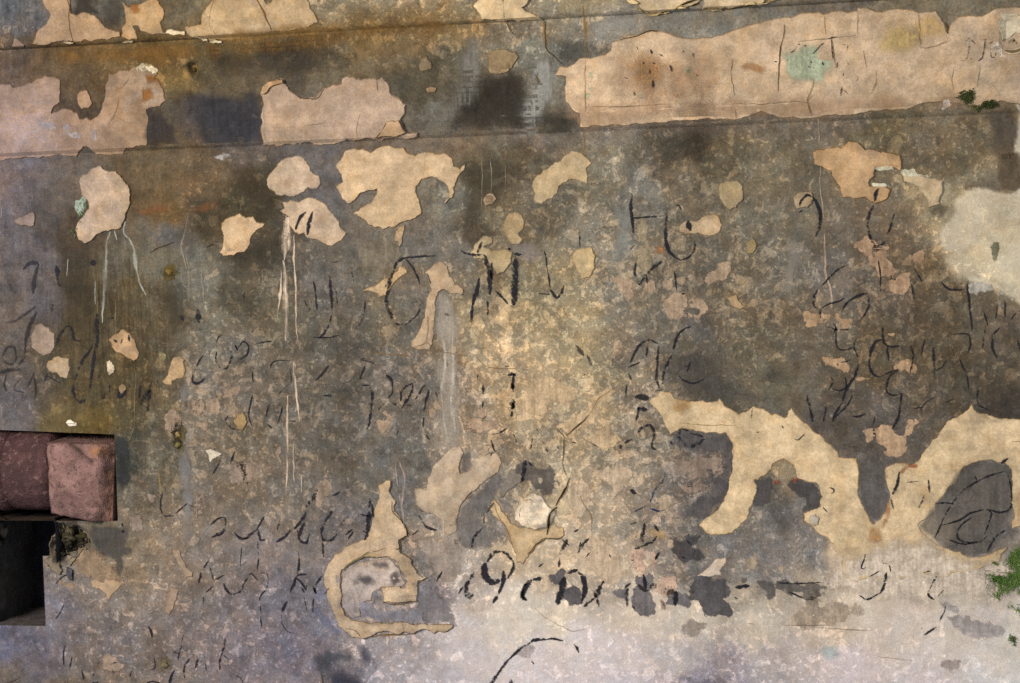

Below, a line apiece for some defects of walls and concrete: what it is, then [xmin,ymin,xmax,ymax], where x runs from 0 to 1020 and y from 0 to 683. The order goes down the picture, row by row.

peeling [12,0,319,48]
damp [136,63,158,73]
peeling [555,6,1020,128]
peeling [0,66,166,244]
peeling [258,76,466,297]
damp [873,166,930,177]
damp [999,153,1020,190]
damp [991,242,999,261]
damp [968,282,1016,301]
spalling [650,391,1020,583]
spalling [324,446,502,639]
damp [332,673,359,683]